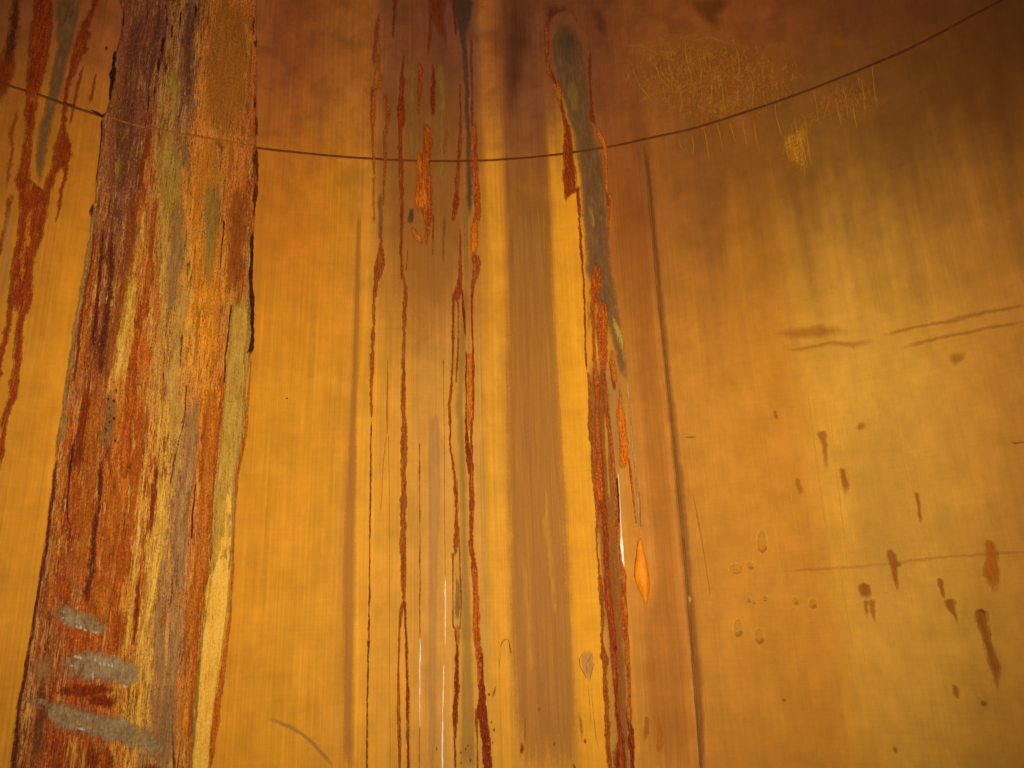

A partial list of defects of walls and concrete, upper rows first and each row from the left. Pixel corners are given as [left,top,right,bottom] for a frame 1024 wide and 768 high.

corrosion [0,0,259,768]
corrosion [366,20,410,768]
corrosion [448,41,495,768]
leakage [508,200,572,754]
corrosion [544,22,637,768]
corrosion [859,583,874,614]
corrosion [888,550,900,586]
corrosion [976,610,999,677]
corrosion [984,541,999,587]